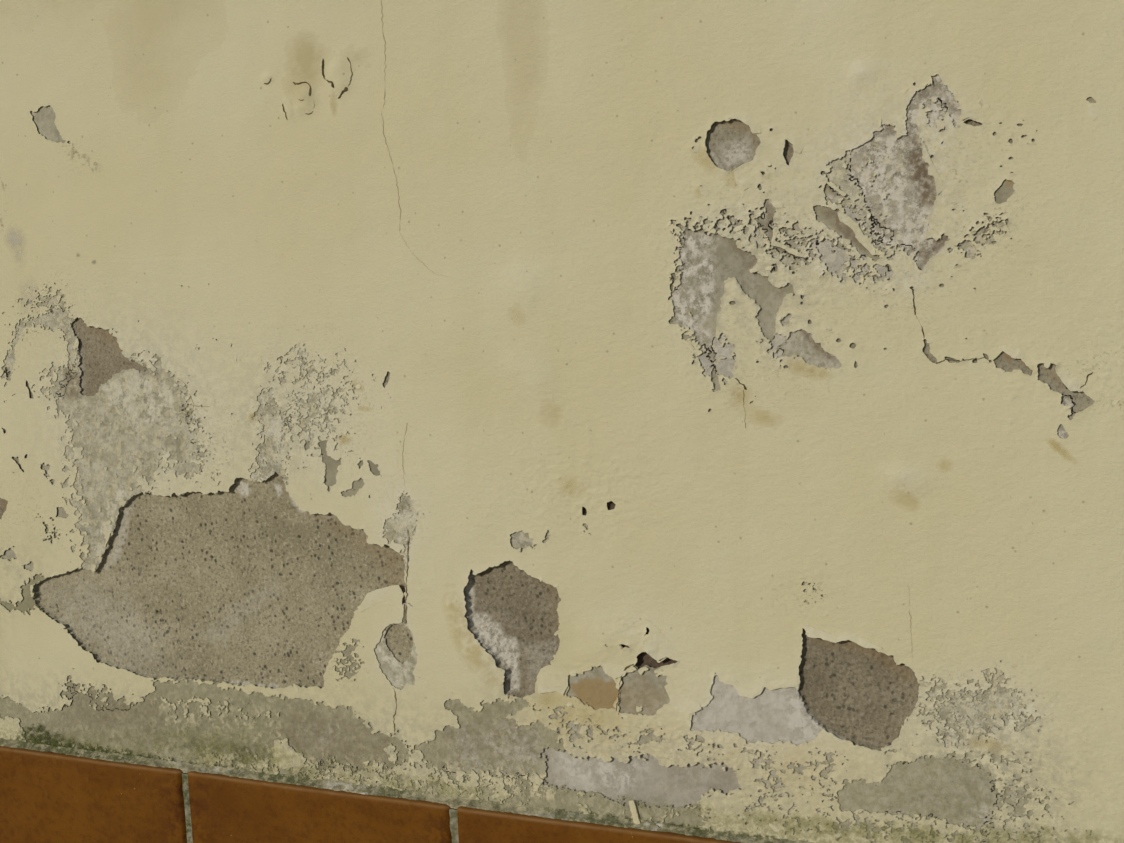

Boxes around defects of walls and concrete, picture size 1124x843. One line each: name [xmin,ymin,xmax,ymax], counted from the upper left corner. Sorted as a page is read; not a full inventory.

peeling [30,105,71,144]
peeling [666,74,1042,392]
flaking render [0,283,1095,843]